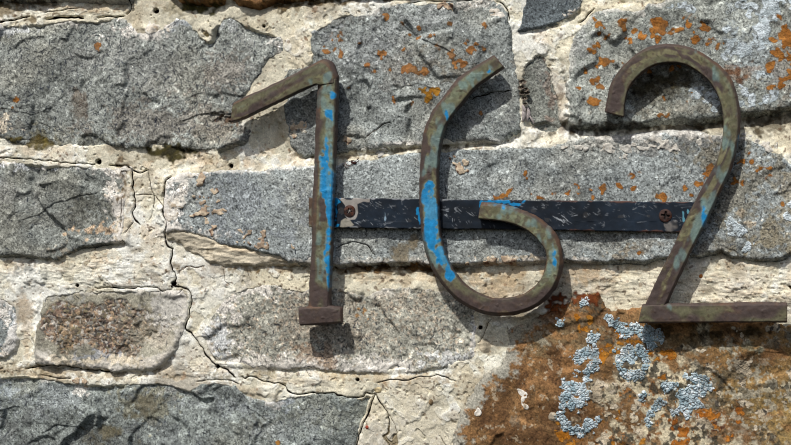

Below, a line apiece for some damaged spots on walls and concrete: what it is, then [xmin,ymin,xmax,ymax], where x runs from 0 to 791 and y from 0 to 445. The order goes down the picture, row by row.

crack [0,0,132,23]
crack [0,157,455,445]